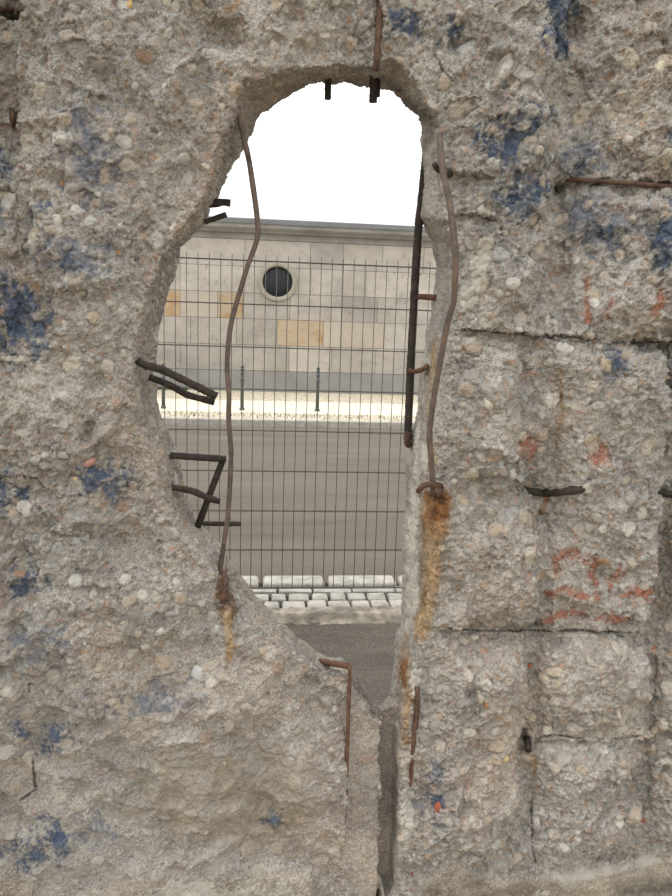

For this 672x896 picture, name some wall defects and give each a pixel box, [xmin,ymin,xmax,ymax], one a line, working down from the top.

spalling [324,78,332,100]
spalling [135,106,261,573]
rust [216,568,237,661]
rust [398,488,453,748]